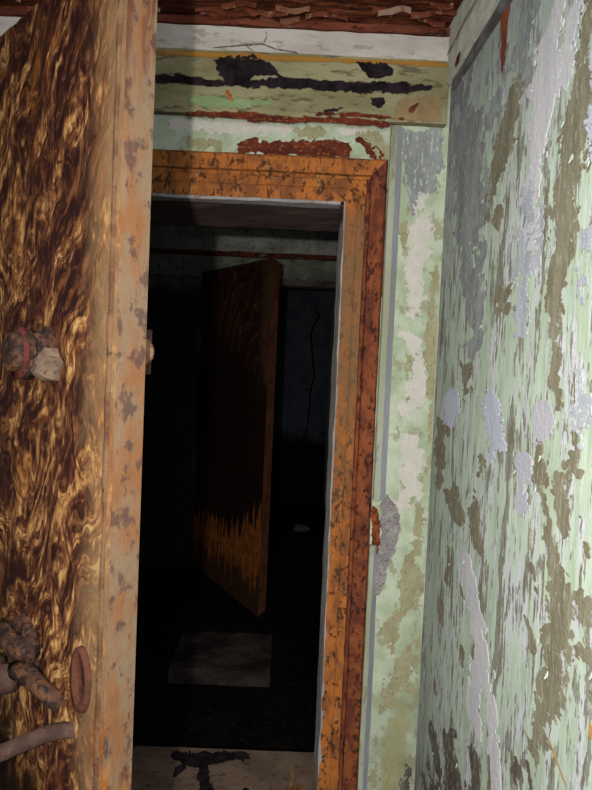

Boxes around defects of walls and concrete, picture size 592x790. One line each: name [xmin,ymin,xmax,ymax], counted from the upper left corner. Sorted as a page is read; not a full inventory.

peeling [367,0,592,790]